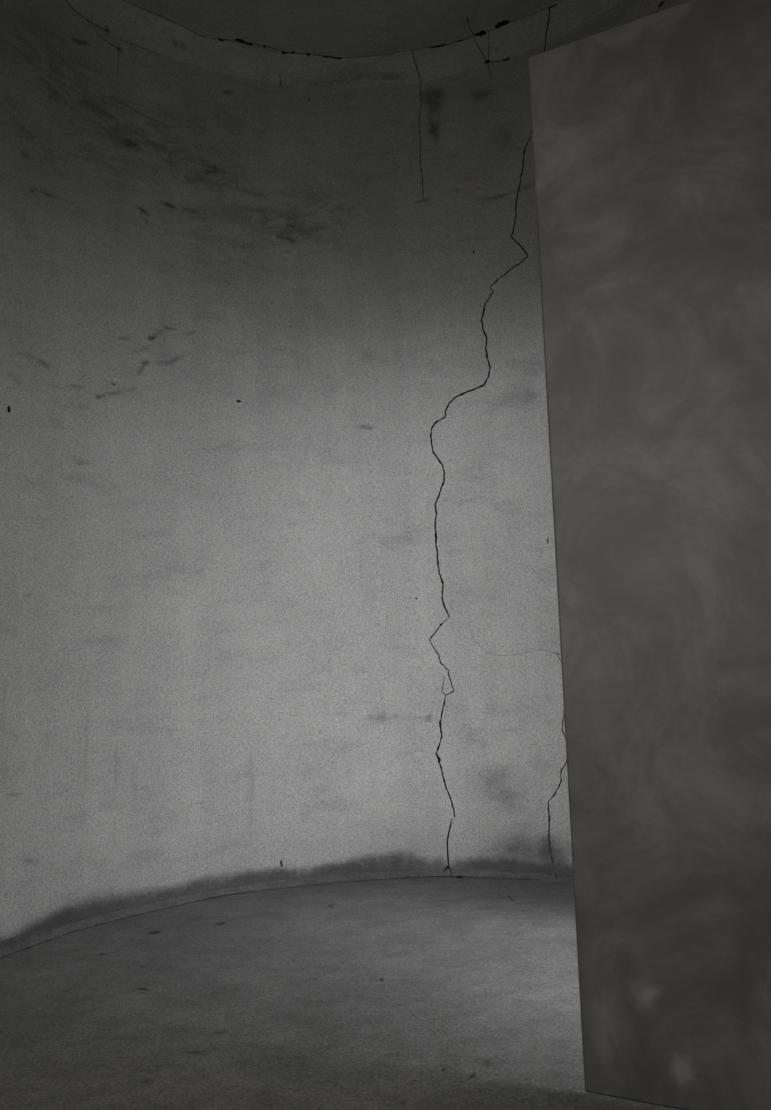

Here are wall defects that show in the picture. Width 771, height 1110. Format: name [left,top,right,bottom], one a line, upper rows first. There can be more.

crack [123,0,563,203]
crack [429,132,561,878]
crack [548,710,567,879]